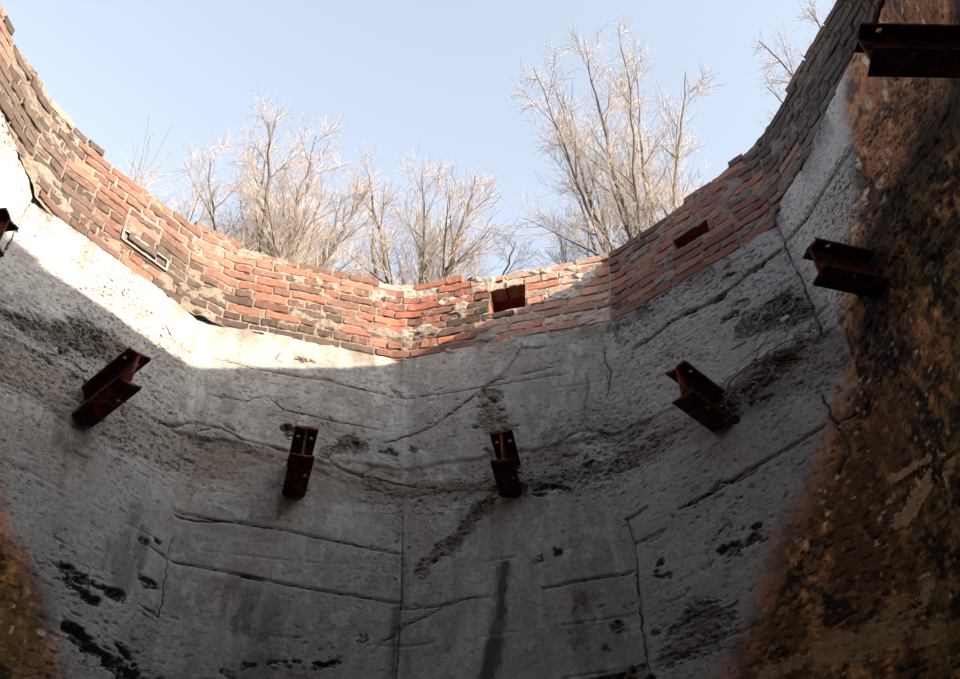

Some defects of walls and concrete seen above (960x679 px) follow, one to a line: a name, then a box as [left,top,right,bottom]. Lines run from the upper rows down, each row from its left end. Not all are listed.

crack [777,223,827,337]
spalling [714,286,820,351]
spalling [719,348,810,425]
spalling [56,562,125,608]
spalling [59,621,164,679]
spalling [137,574,161,590]
spalling [203,656,341,679]
water stain [476,560,510,679]
crack [628,507,666,679]